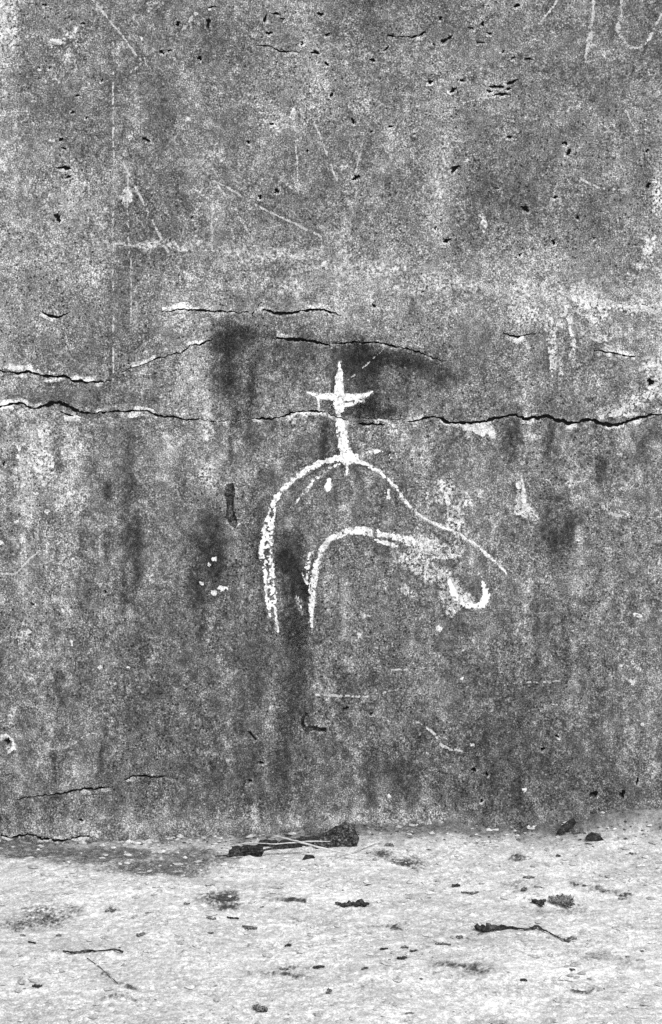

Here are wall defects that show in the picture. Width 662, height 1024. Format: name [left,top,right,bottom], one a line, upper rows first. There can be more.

leakage [196,456,220,489]
leakage [198,407,220,442]
leakage [209,324,258,463]
crack [0,300,662,431]
leakage [186,510,227,607]
leakage [275,531,313,712]
crack [17,771,167,804]